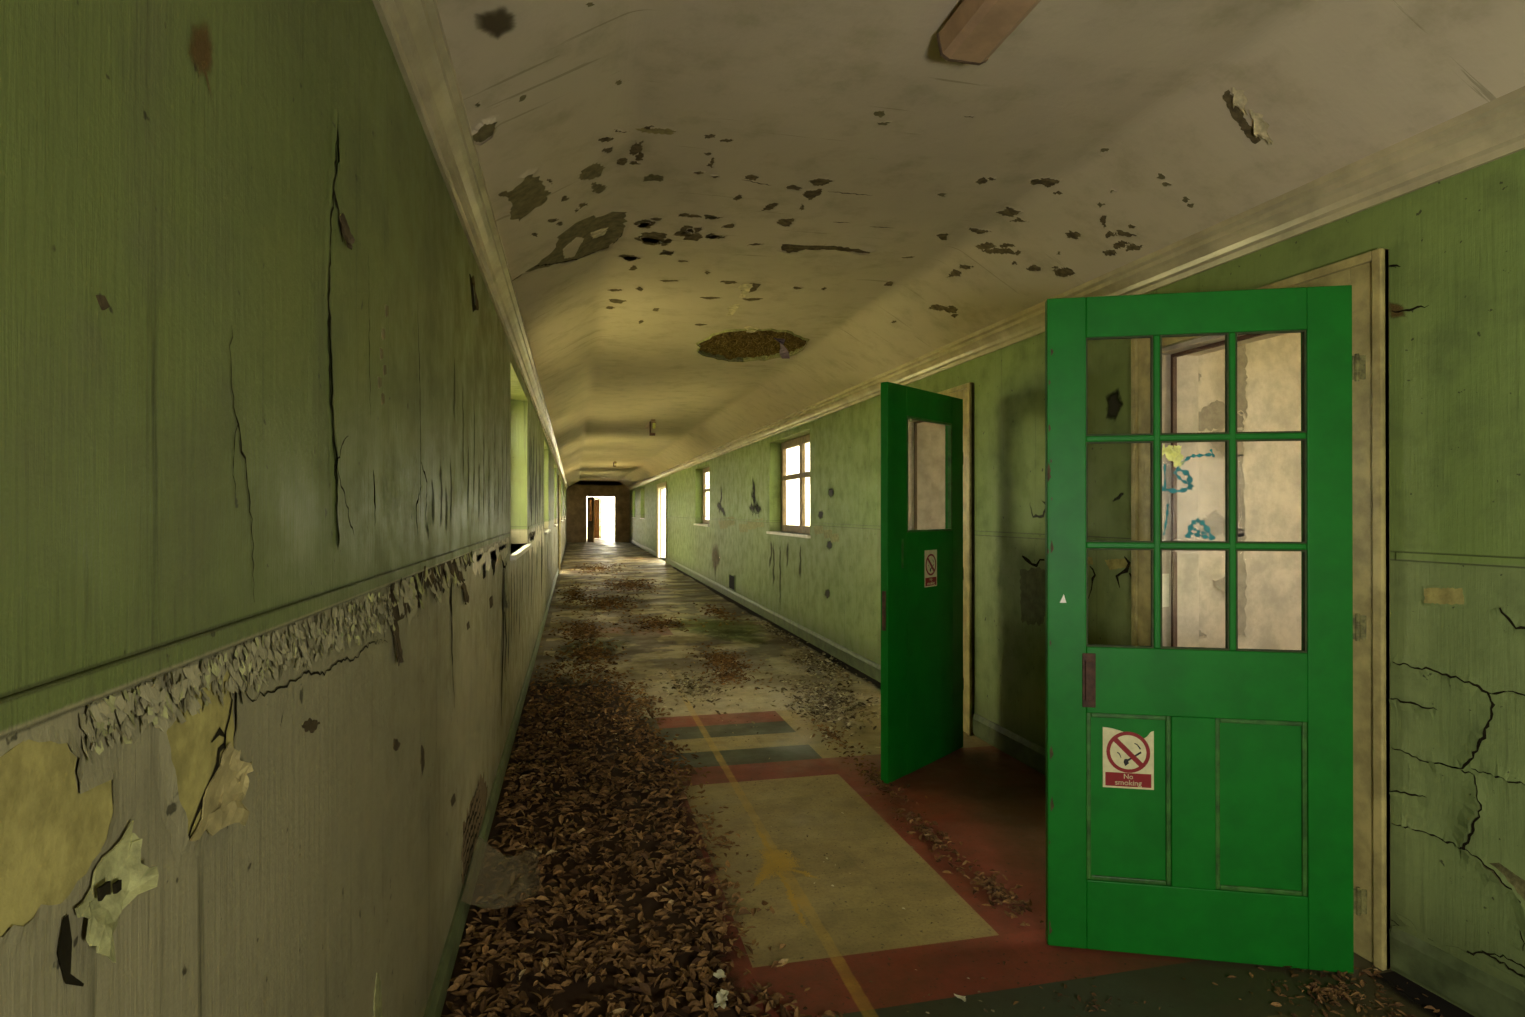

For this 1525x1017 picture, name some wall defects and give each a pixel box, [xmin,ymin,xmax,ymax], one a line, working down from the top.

peeling [471,100,505,146]
peeling [490,125,765,333]
peeling [731,173,880,256]
peeling [933,205,1084,279]
peeling [1027,175,1064,195]
peeling [1096,188,1147,258]
peeling [1154,172,1195,208]
crack [322,106,376,557]
peeling [469,274,479,312]
peeling [926,302,960,319]
flaking render [0,538,509,986]
crack [1389,604,1525,950]